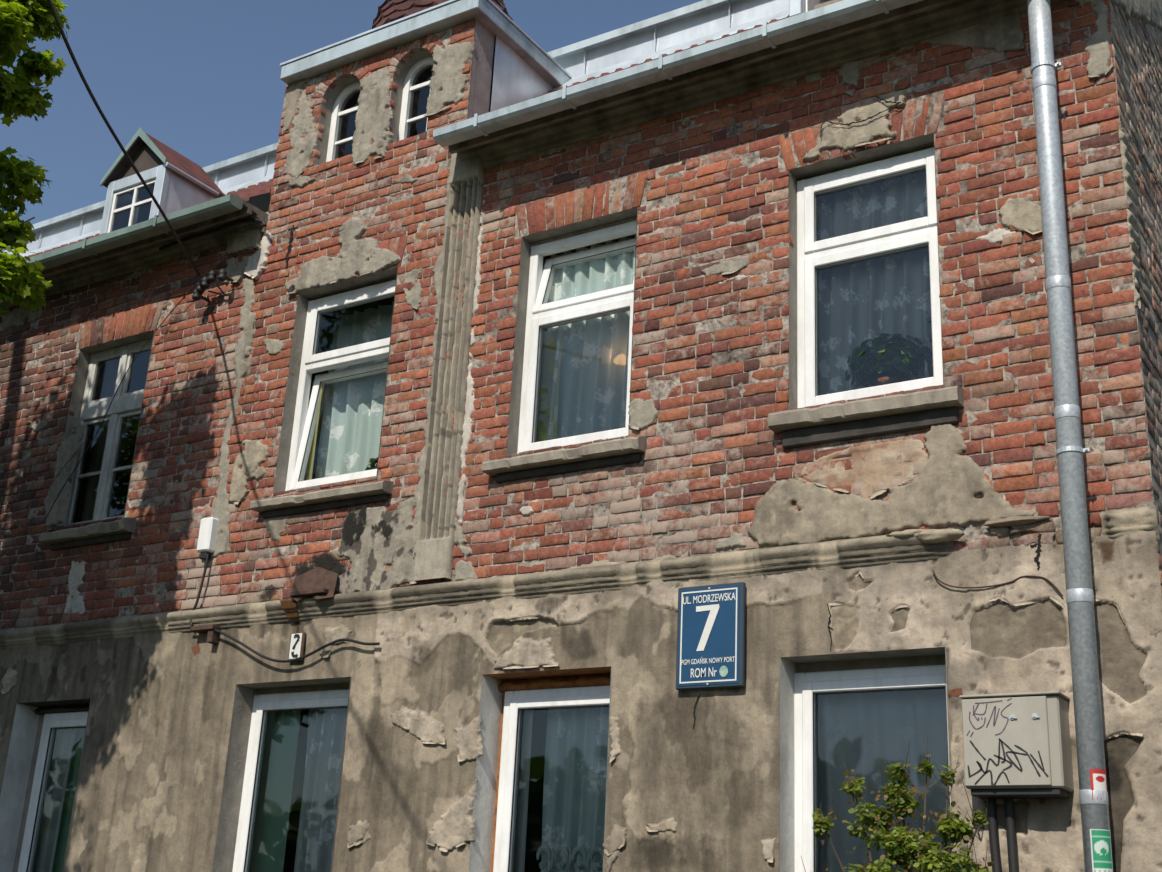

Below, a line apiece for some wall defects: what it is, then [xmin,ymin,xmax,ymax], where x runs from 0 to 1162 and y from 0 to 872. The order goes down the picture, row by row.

peeling [351,66,394,165]
peeling [424,42,475,118]
peeling [802,13,1024,162]
crack [1121,122,1162,188]
peeling [210,229,285,559]
water stain [341,504,393,545]
peeling [715,424,1063,552]
water stain [259,585,277,599]
water stain [292,551,350,578]
peeling [486,615,561,670]
spalling [969,596,1067,659]
spalling [1104,730,1144,872]